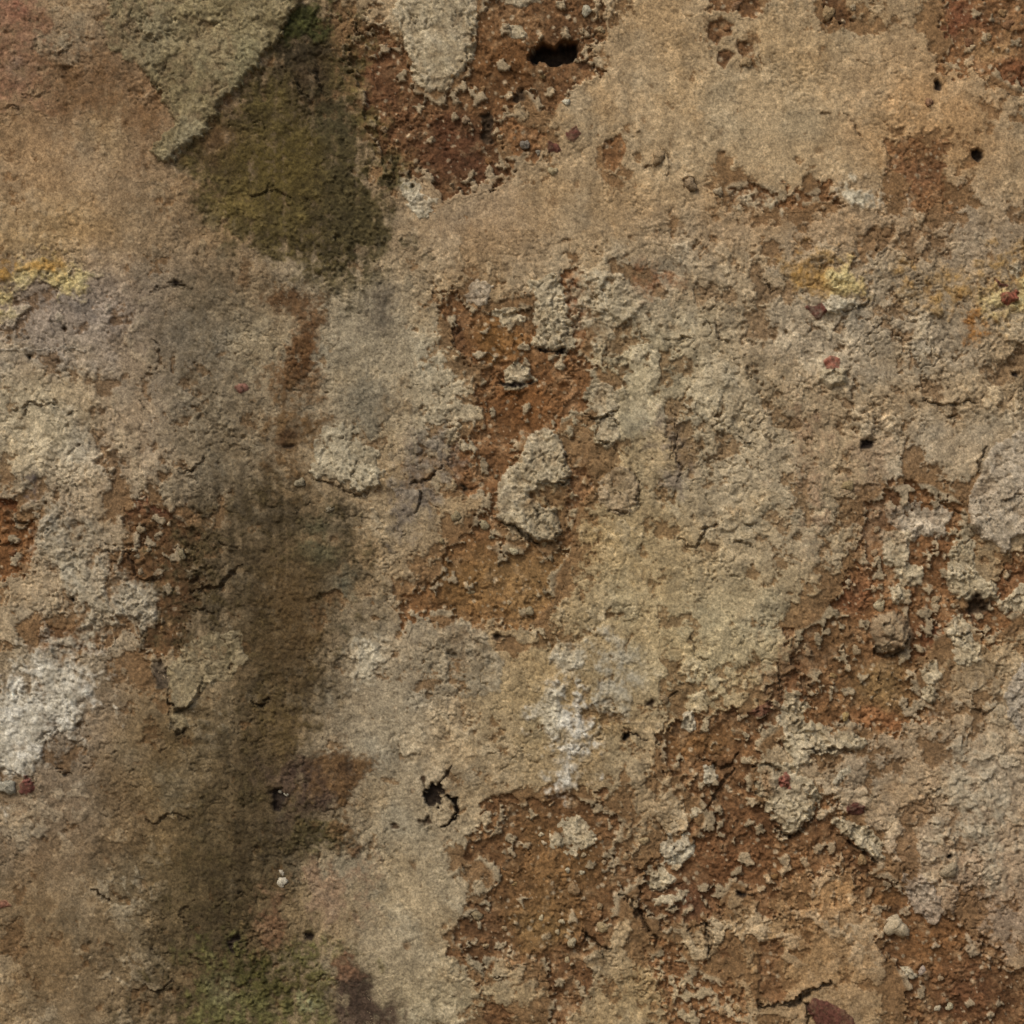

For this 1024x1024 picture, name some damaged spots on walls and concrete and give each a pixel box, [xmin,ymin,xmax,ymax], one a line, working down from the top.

flaking render [343,0,608,219]
leakage [0,195,477,556]
flaking render [393,267,638,646]
leakage [144,657,172,699]
leakage [245,744,314,842]
efflorescence [338,629,394,700]
flaking render [443,471,1024,1024]
leakage [311,947,430,1024]